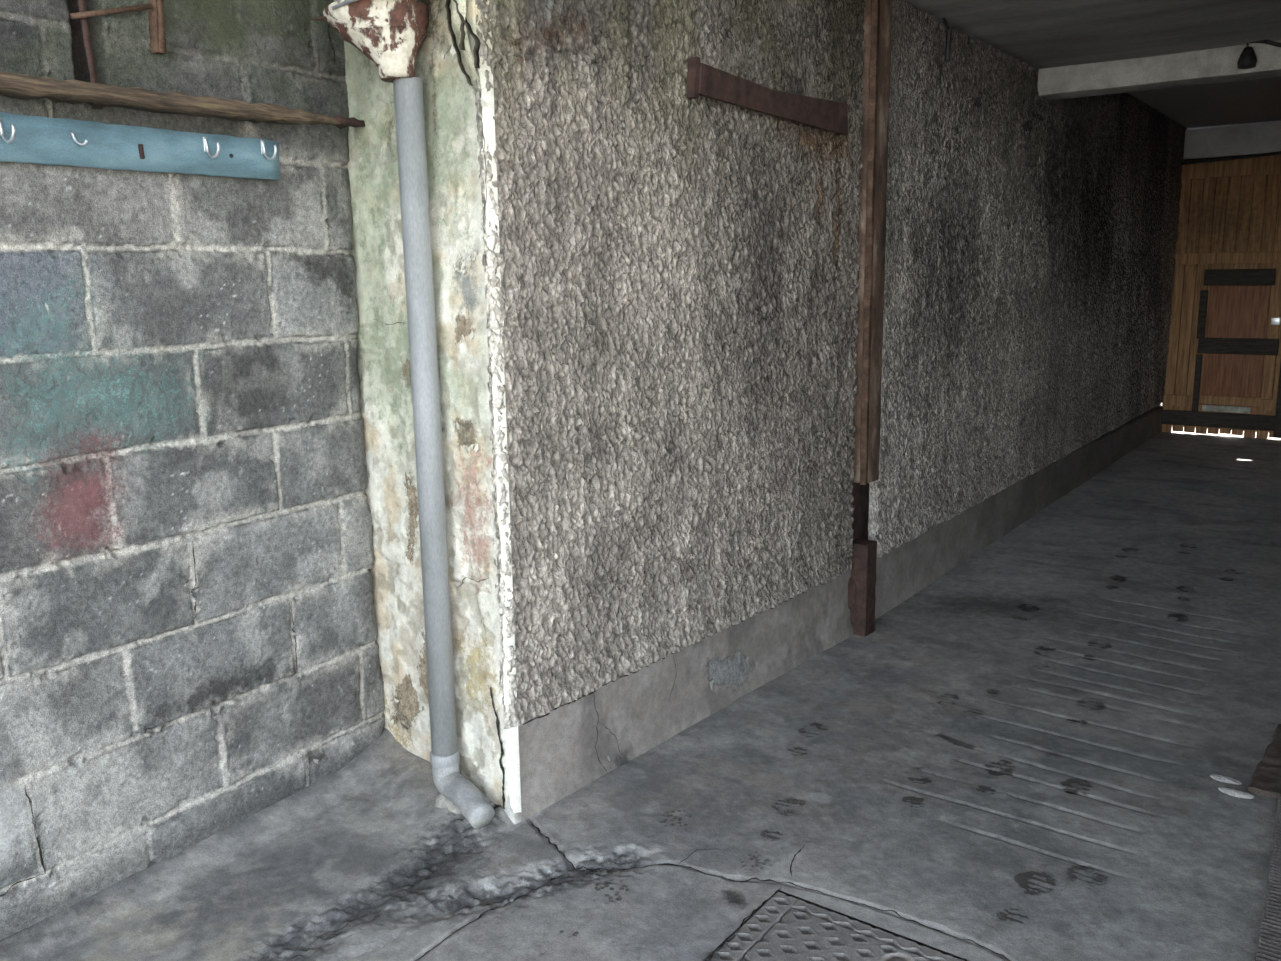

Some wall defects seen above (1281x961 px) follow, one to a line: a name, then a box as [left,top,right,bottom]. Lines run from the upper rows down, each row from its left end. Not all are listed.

peeling [400,472,419,565]
peeling [391,631,429,731]
crack [415,621,1010,961]